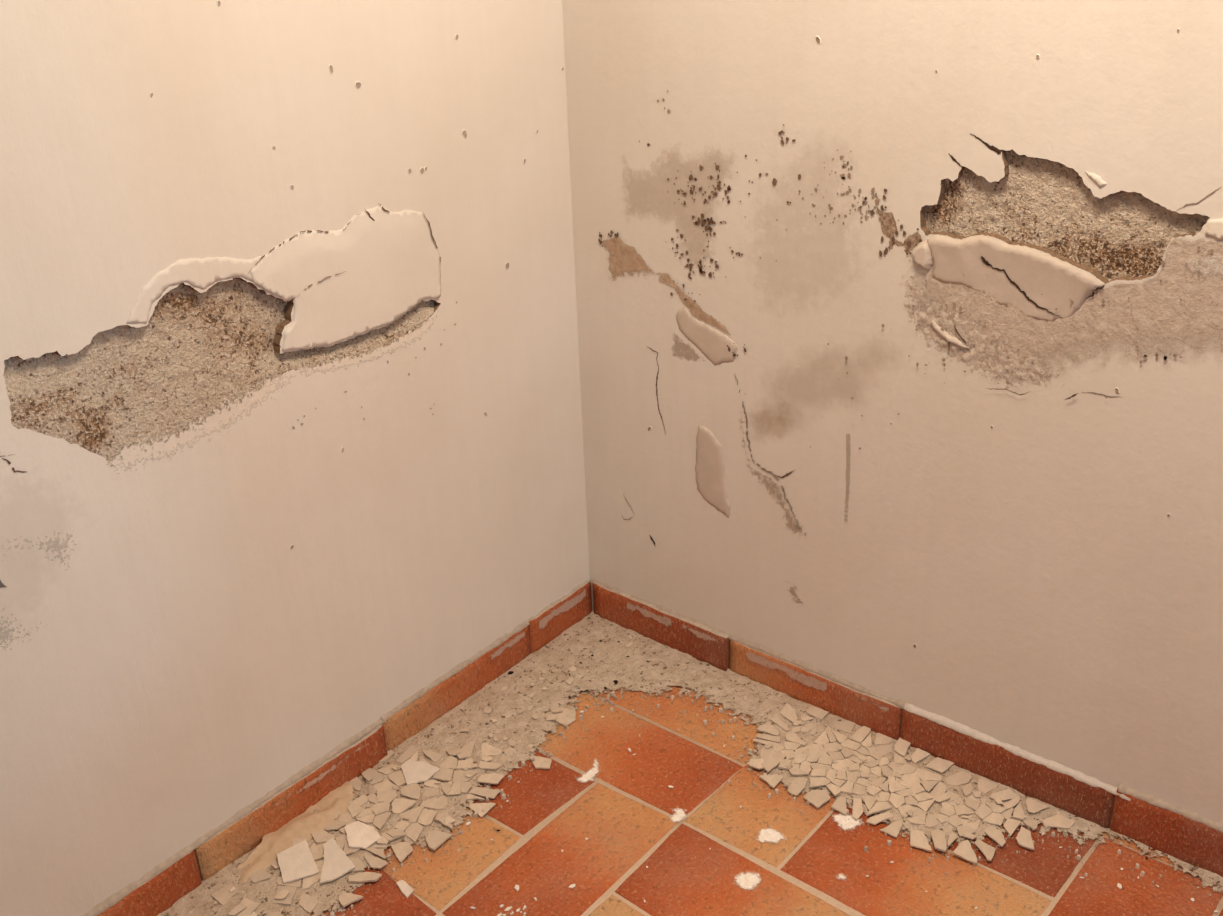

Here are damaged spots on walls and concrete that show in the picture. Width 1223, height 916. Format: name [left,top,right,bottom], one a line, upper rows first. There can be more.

flaking render [3,256,437,474]
flaking render [598,155,806,534]
flaking render [786,149,1223,400]
flaking render [320,838,355,884]
flaking render [529,756,552,769]